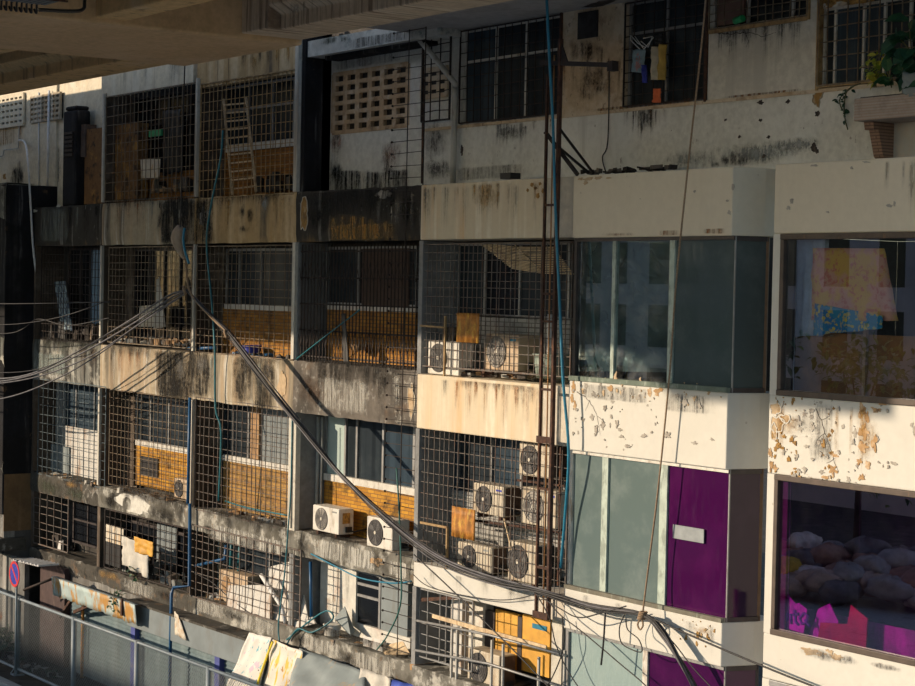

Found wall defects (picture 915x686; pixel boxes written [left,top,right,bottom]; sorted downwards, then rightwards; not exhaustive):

peeling [812,88,824,116]
damp [712,139,816,165]
damp [312,147,412,231]
damp [43,196,212,244]
damp [156,350,212,399]
damp [234,356,274,408]
peeling [570,371,663,451]
peeling [768,397,898,484]
spalling [114,493,150,515]